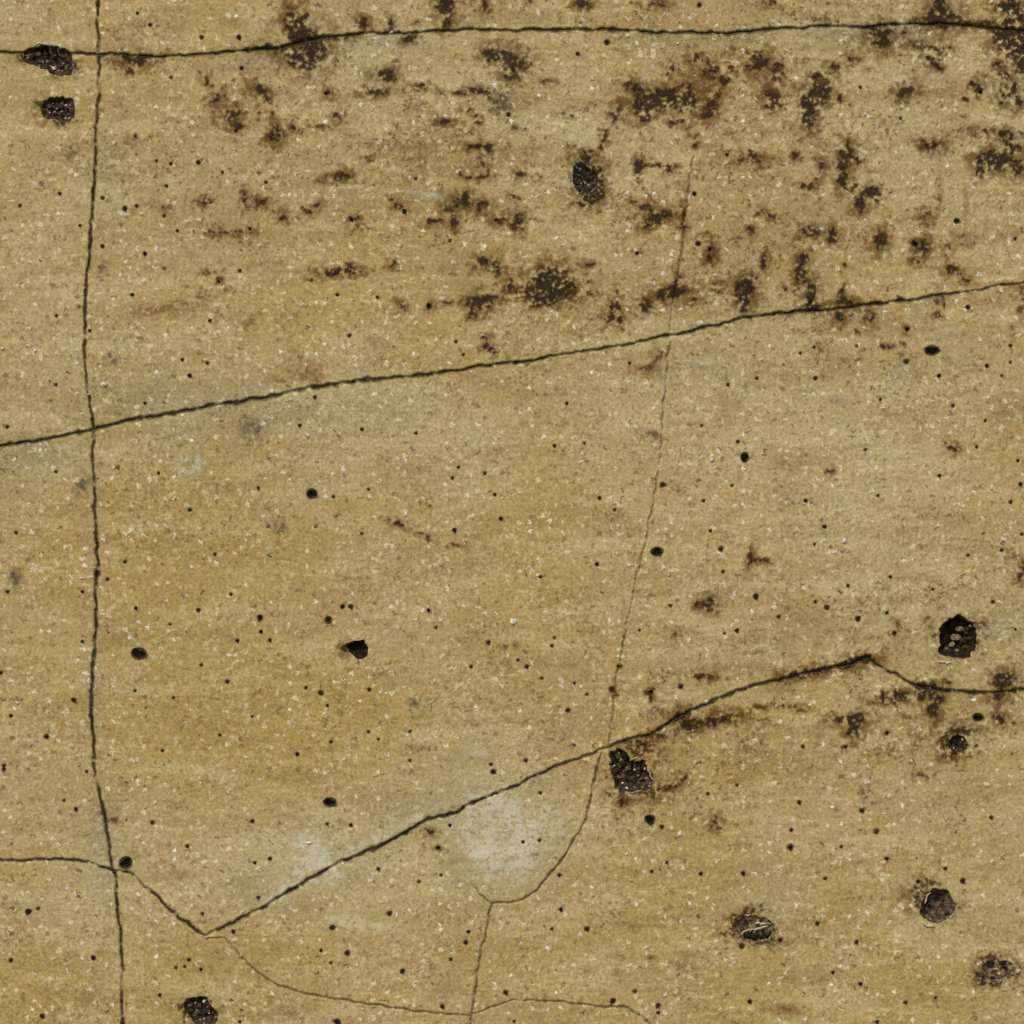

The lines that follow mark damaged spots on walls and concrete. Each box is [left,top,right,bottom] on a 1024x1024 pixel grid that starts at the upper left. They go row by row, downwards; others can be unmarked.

hole [17,42,78,78]
crack [69,0,830,76]
leakage [862,0,1024,113]
hole [34,96,78,127]
leakage [579,46,861,154]
leakage [965,126,1024,179]
leakage [425,255,599,321]
crack [298,283,1014,391]
crack [0,92,329,967]
hole [929,615,983,664]
hole [605,739,660,801]
crack [342,658,1024,862]